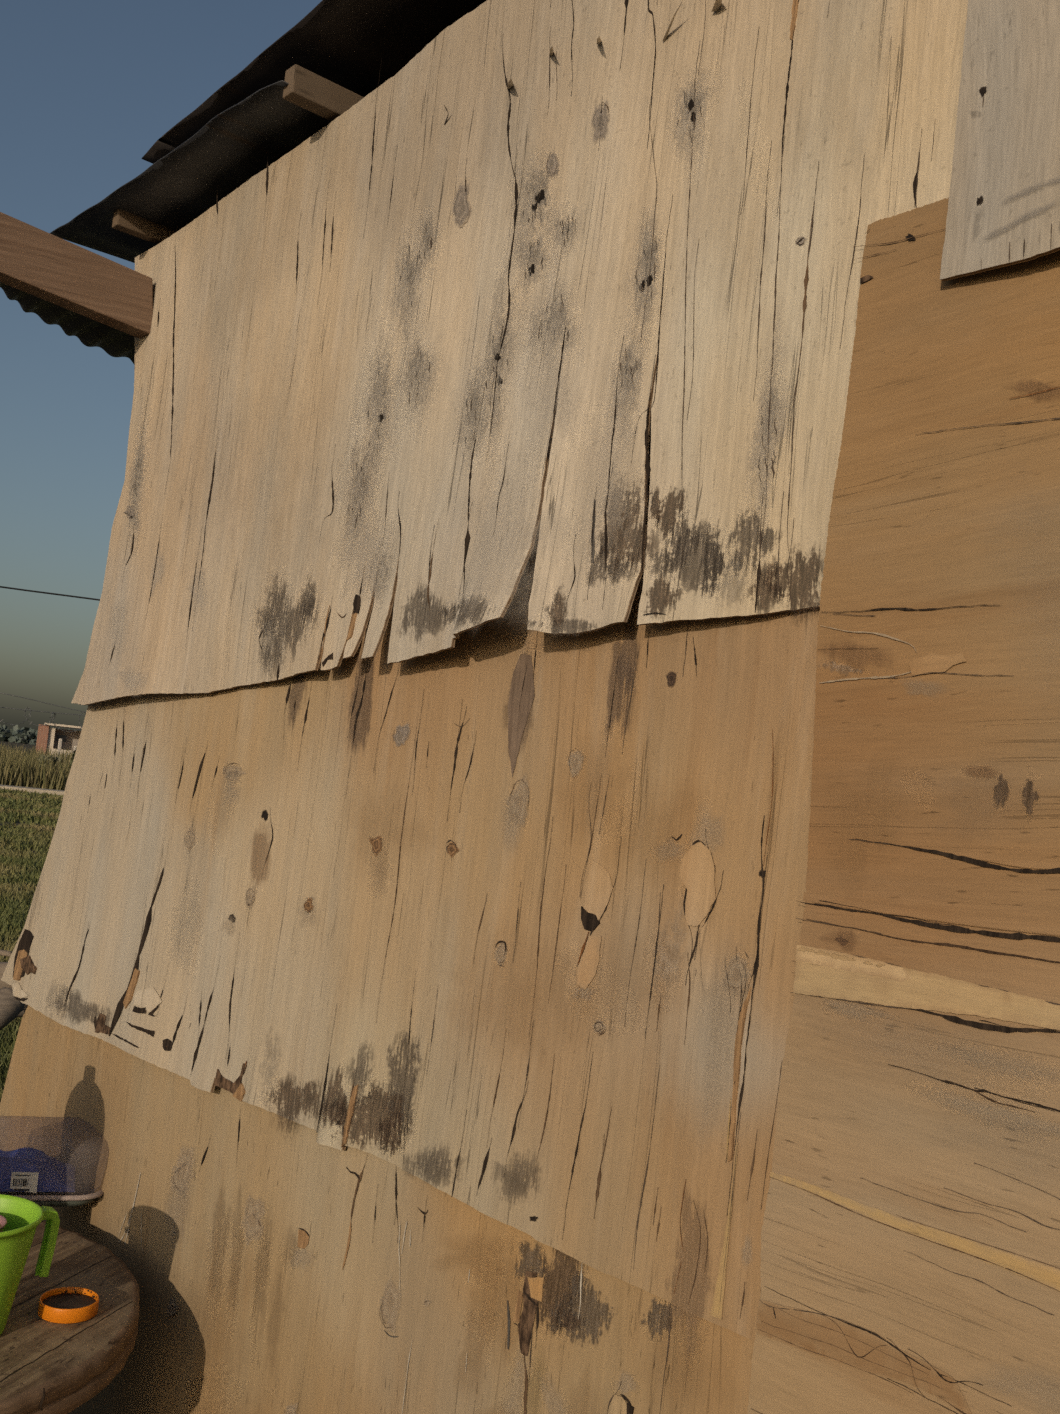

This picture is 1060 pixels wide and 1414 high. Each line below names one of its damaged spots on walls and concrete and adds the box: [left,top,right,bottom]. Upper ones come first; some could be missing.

crack [547,0,609,114]
crack [382,37,557,623]
crack [565,0,706,611]
leakage [261,583,314,663]
crack [675,519,697,677]
leakage [590,488,820,617]
crack [342,633,649,1270]
leakage [271,1037,419,1154]
crack [562,862,699,1269]
crack [747,1063,782,1207]